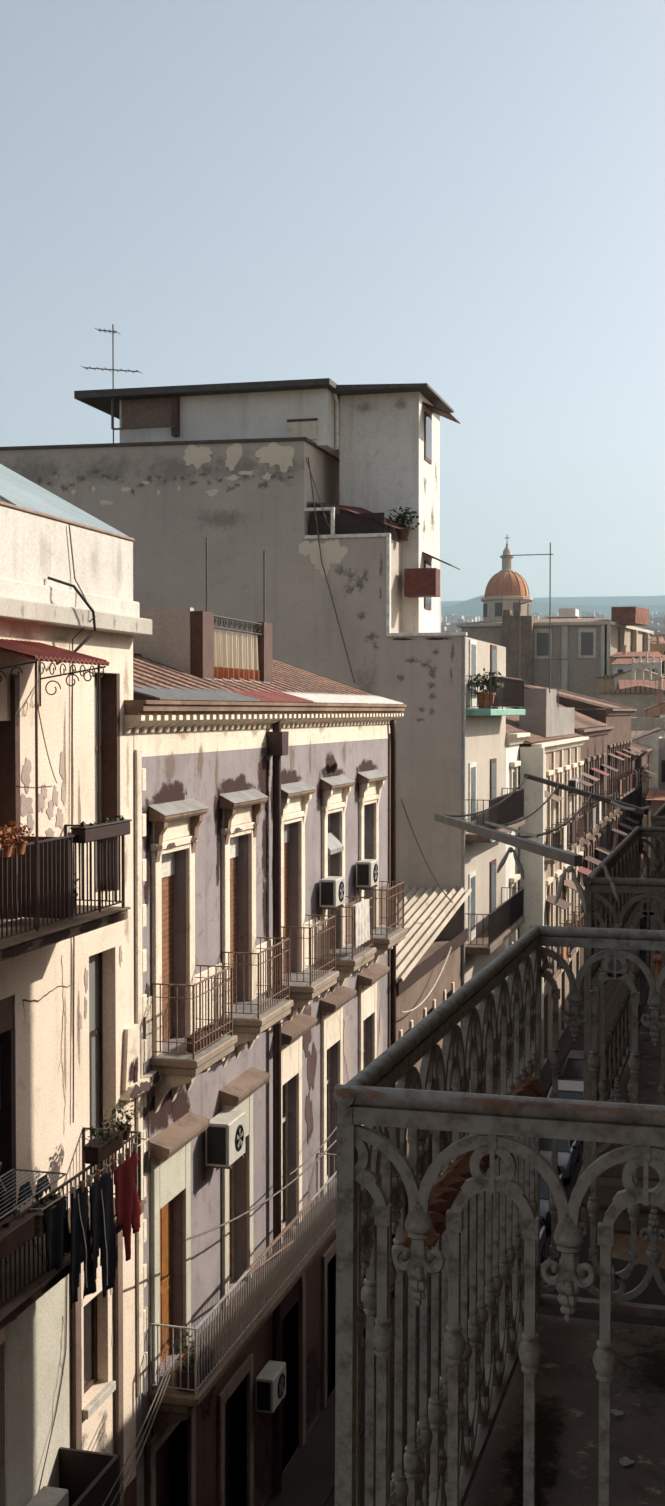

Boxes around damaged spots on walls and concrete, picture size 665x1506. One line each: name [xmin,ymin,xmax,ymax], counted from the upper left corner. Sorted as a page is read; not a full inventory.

spalling [183,442,294,497]